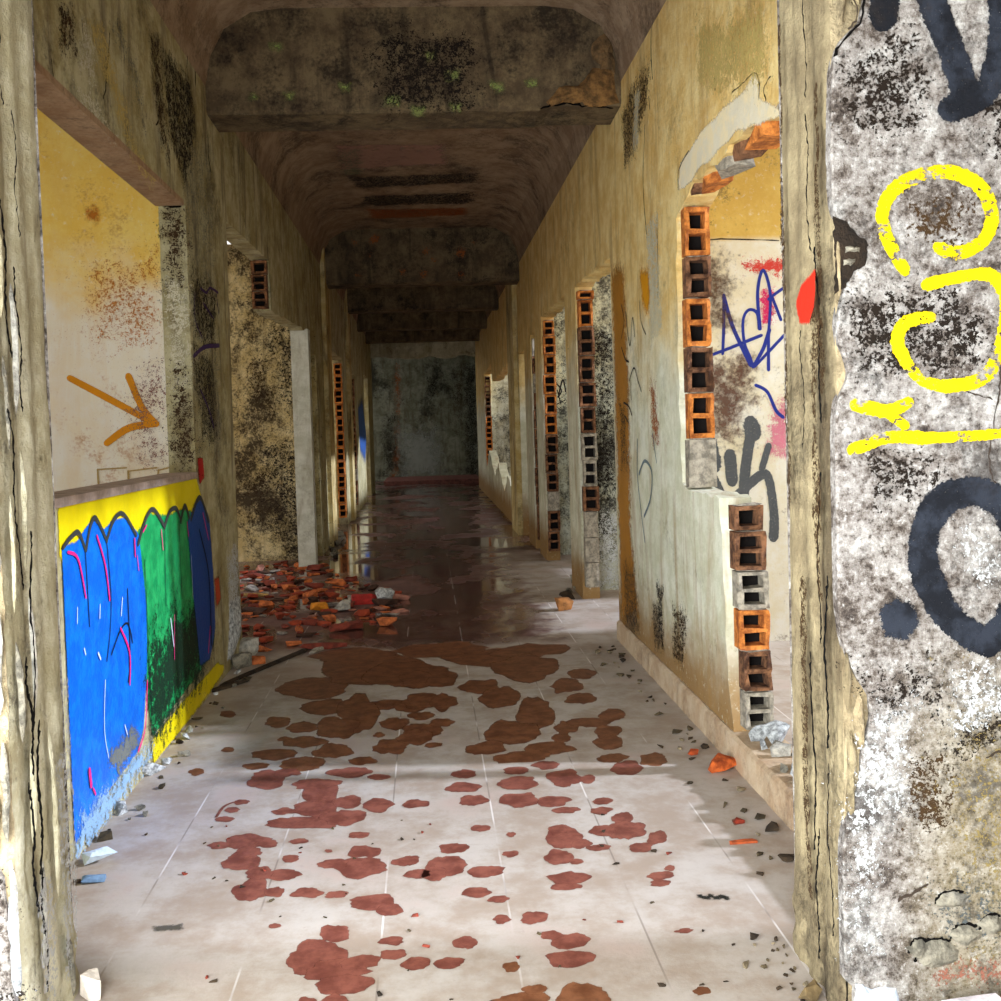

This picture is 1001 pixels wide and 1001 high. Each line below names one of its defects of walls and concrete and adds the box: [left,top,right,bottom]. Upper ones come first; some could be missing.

water stain [56,0,298,559]
flaking render [678,72,780,488]
crack [799,0,822,448]
crack [833,0,866,57]
crack [0,85,50,992]
crack [809,472,835,959]